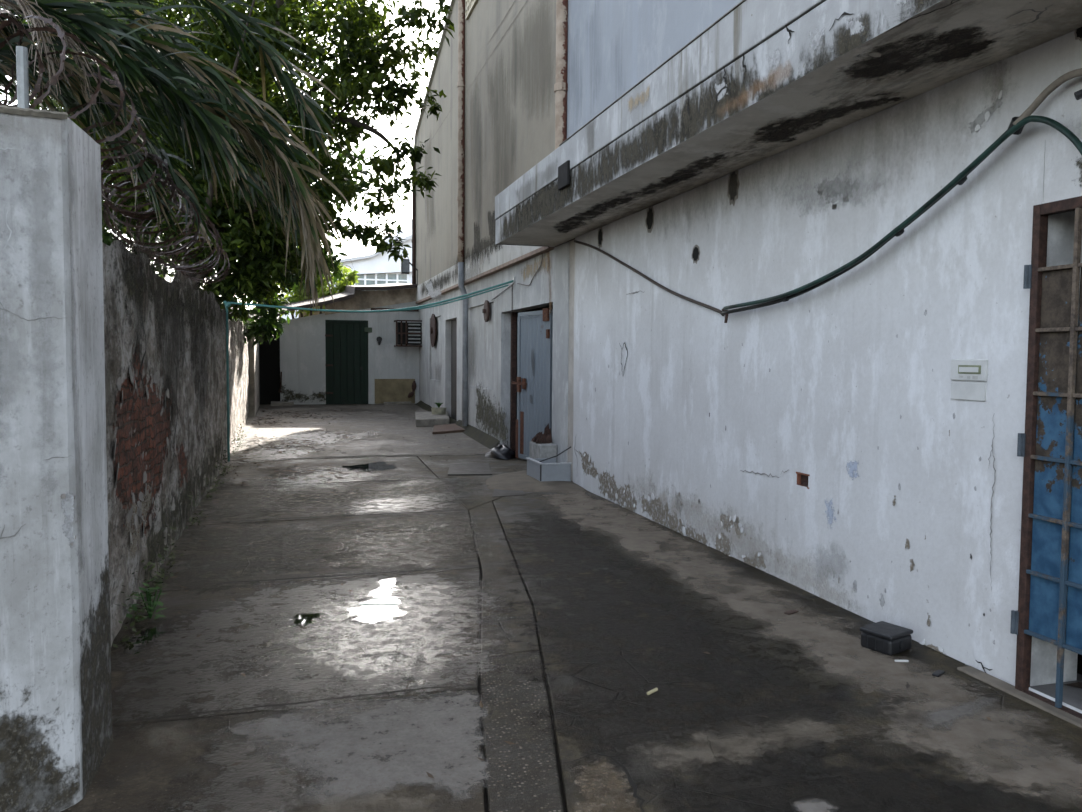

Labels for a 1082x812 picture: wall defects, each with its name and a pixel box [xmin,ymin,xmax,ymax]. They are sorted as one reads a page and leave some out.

water stain [422,14,872,295]
peeling [715,80,728,100]
peeling [845,15,864,35]
flaking render [112,339,189,565]
spalling [579,452,772,568]
crack [988,413,996,590]